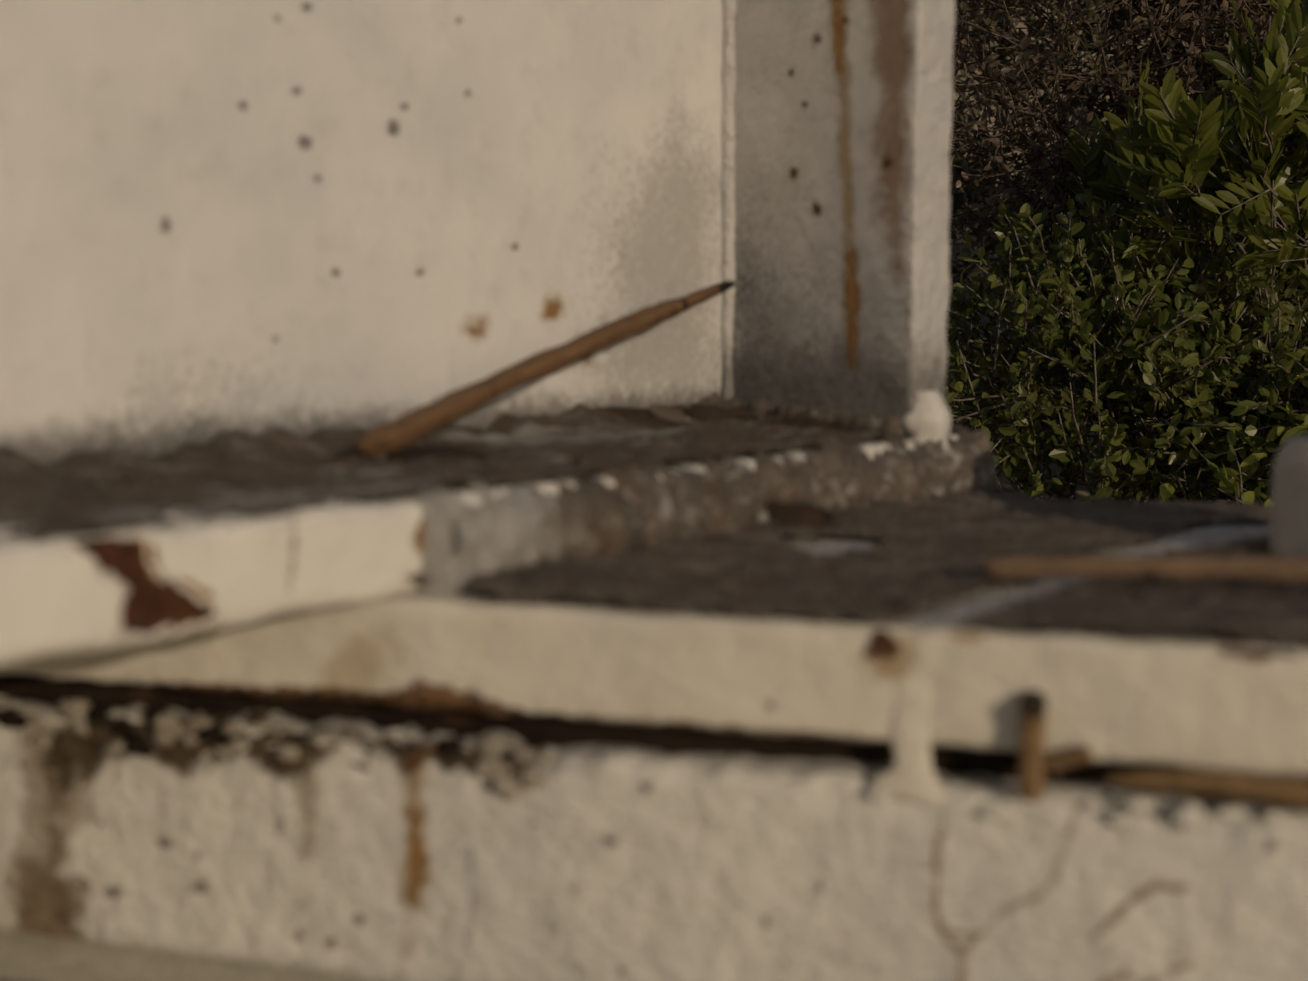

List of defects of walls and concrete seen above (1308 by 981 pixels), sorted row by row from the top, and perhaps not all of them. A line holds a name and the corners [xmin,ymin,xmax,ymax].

rust [813,0,860,369]
spalling [0,698,556,801]
rust [399,740,437,907]
crack [932,811,979,981]
crack [1096,879,1186,936]